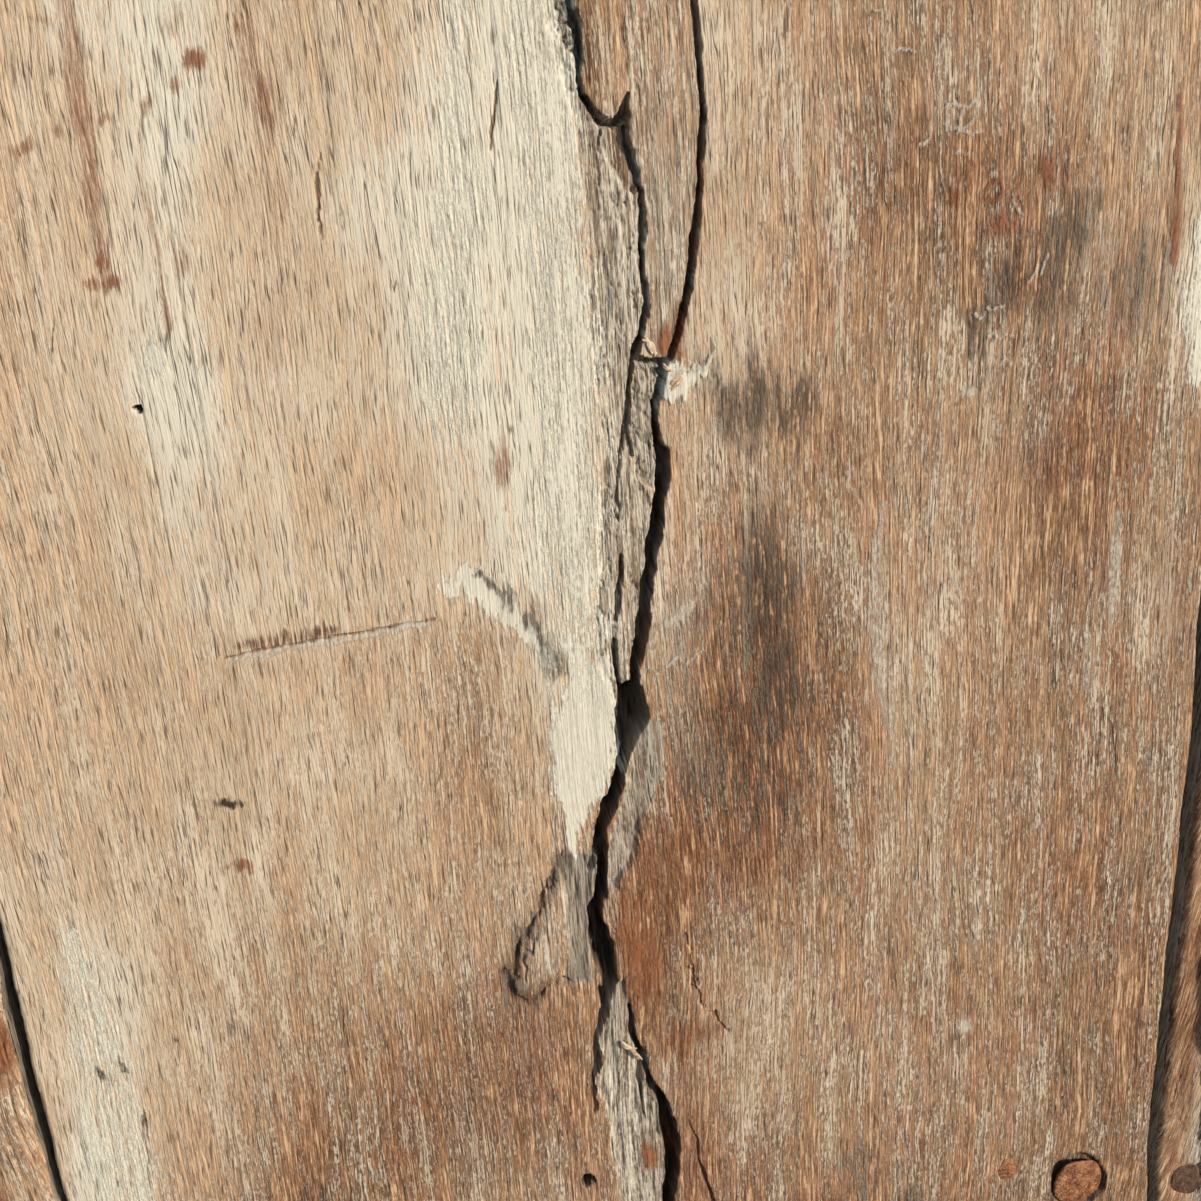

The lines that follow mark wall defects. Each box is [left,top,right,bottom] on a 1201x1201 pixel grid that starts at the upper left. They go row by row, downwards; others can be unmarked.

crack [489,79,499,149]
crack [501,0,716,1201]
crack [685,932,730,1031]